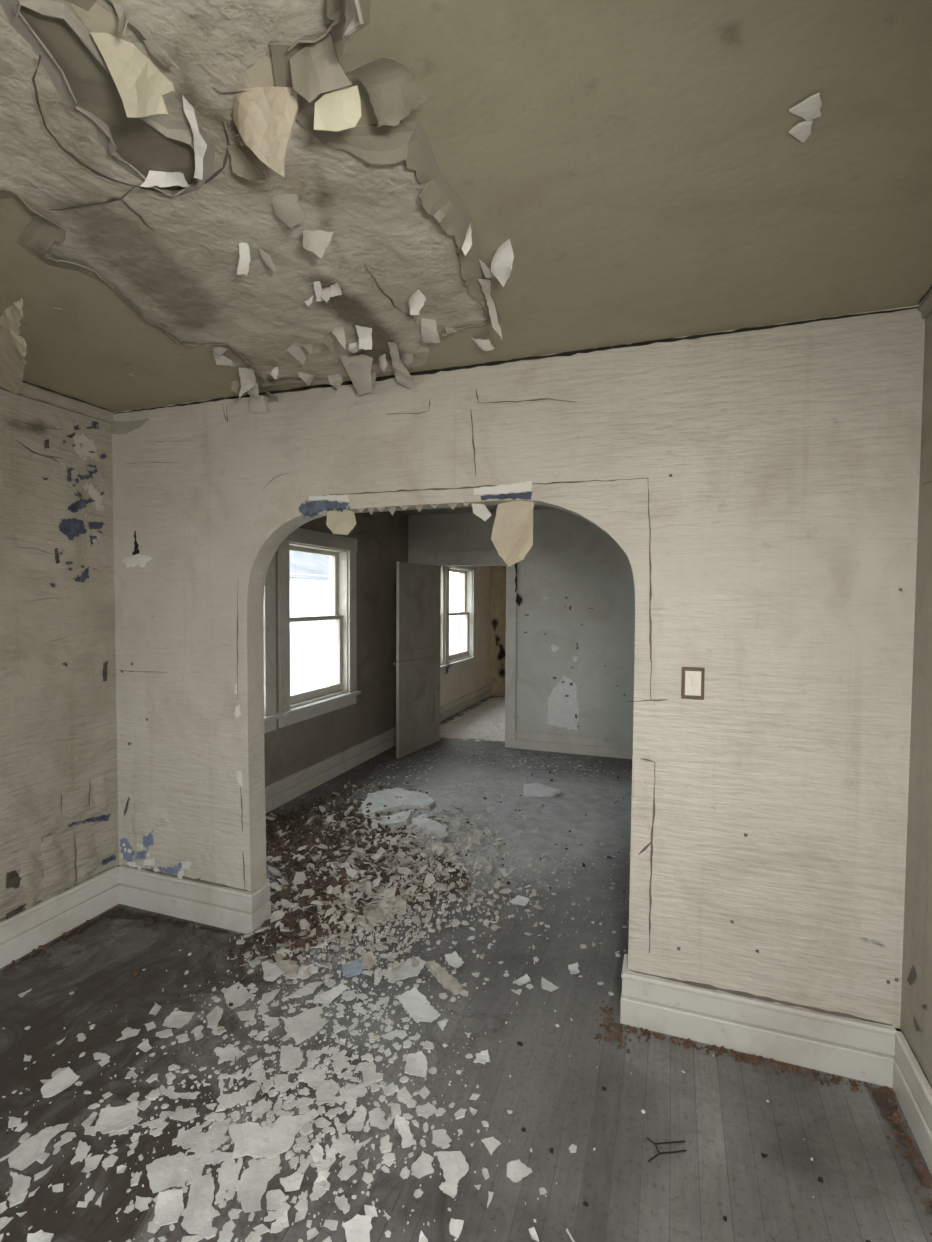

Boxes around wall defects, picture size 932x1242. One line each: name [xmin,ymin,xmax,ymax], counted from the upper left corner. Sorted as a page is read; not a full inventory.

peeling [789,93,822,143]
peeling [0,0,514,413]
peeling [44,419,148,583]
peeling [298,481,534,616]
peeling [544,633,579,732]
peeling [68,797,130,827]
peeling [6,870,21,889]
peeling [102,830,201,882]
peeling [6,903,27,920]